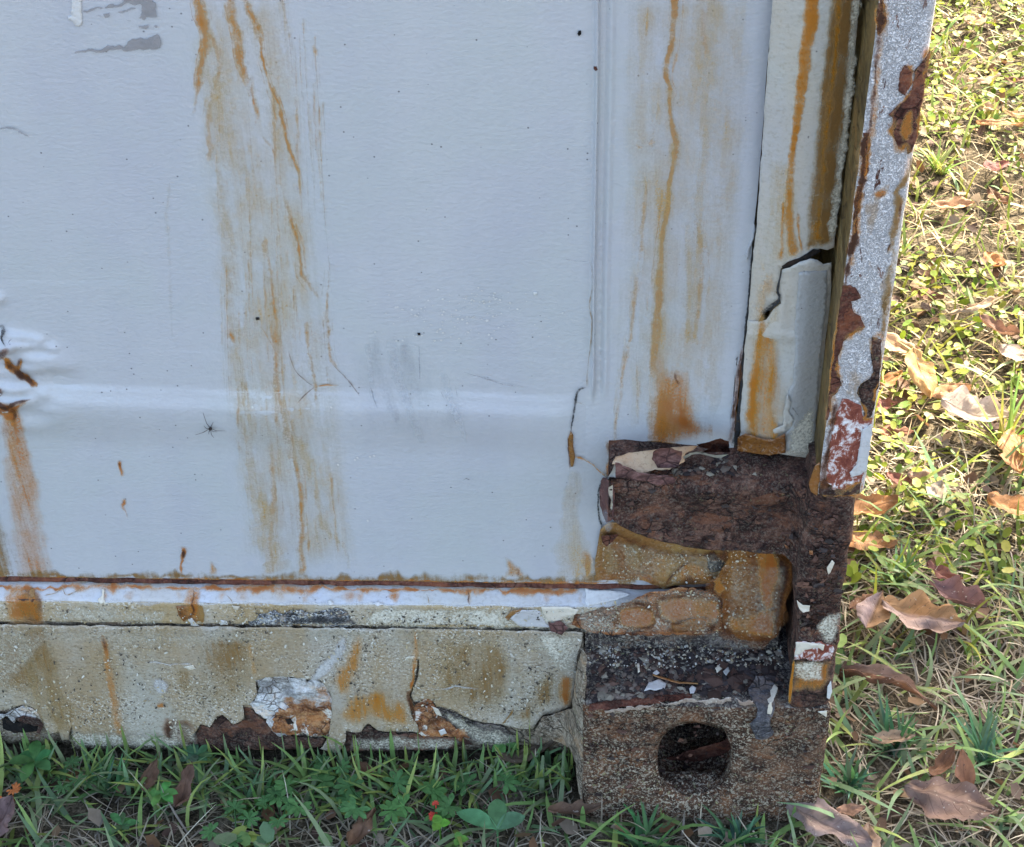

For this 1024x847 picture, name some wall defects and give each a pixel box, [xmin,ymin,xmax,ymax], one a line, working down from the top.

peeling [83,0,157,29]
rust [780,0,861,257]
rust [643,0,680,369]
rust [809,0,933,497]
crack [729,223,821,445]
crack [568,388,609,476]
rust [0,484,602,734]
rust [164,707,325,751]
spalling [249,676,332,737]
crack [404,637,416,718]
rust [345,694,520,752]
rust [748,662,827,740]